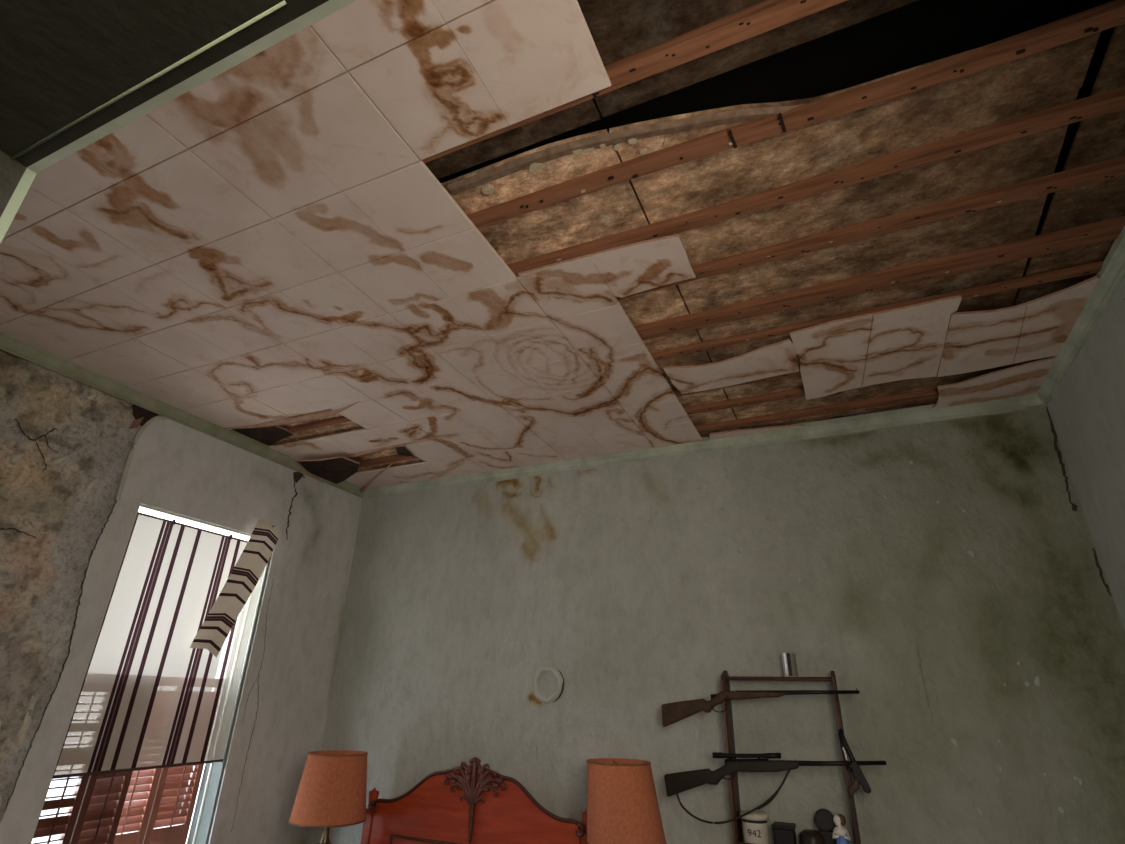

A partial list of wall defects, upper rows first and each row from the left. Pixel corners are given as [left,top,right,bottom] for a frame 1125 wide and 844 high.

damp [428,66,501,134]
peeling [572,138,668,156]
damp [379,324,477,399]
damp [507,368,691,444]
crack [15,419,59,471]
crack [1046,406,1077,511]
crack [286,472,305,540]
crack [1092,548,1111,597]